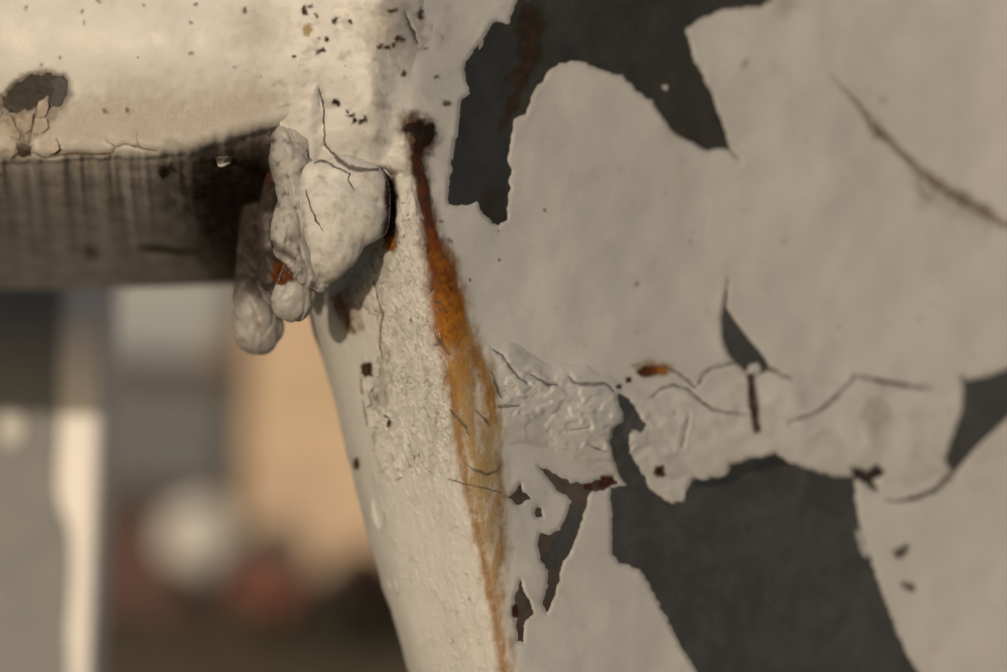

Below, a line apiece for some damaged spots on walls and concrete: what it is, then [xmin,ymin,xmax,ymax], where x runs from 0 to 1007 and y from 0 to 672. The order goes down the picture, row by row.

peeling [0,72,68,158]
crack [0,99,157,158]
crack [314,89,392,189]
peeling [448,0,771,225]
crack [842,87,1006,226]
crack [305,189,323,231]
corrosion [411,154,505,654]
crack [496,352,614,392]
corrosion [616,363,668,389]
peeling [698,279,794,385]
crack [793,377,933,422]
peeling [507,369,1007,672]